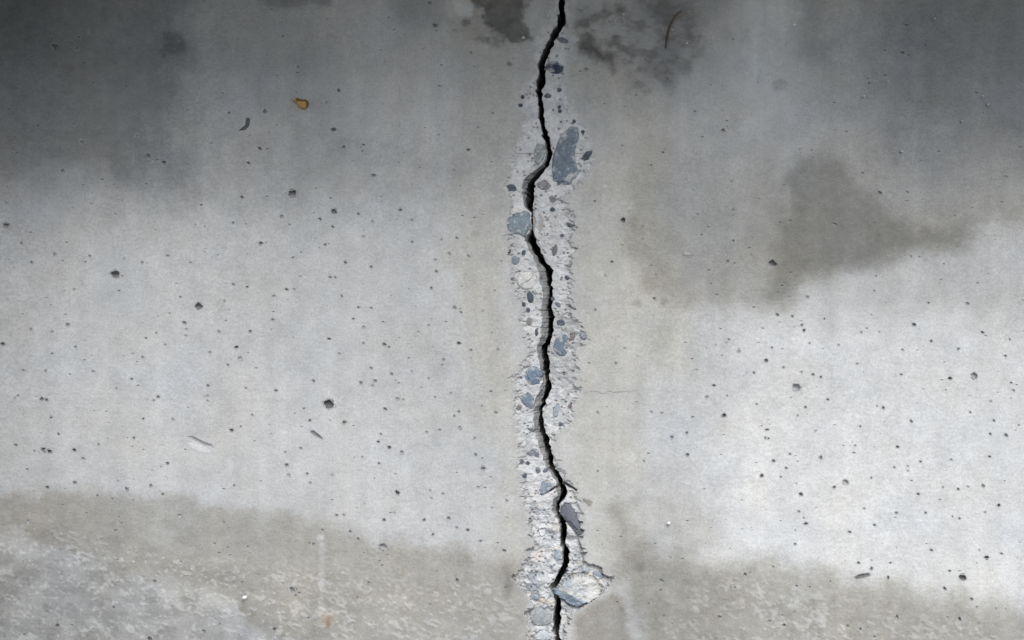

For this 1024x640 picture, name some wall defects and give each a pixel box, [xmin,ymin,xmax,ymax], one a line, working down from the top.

crack [508,0,577,640]
spalling [500,0,617,640]